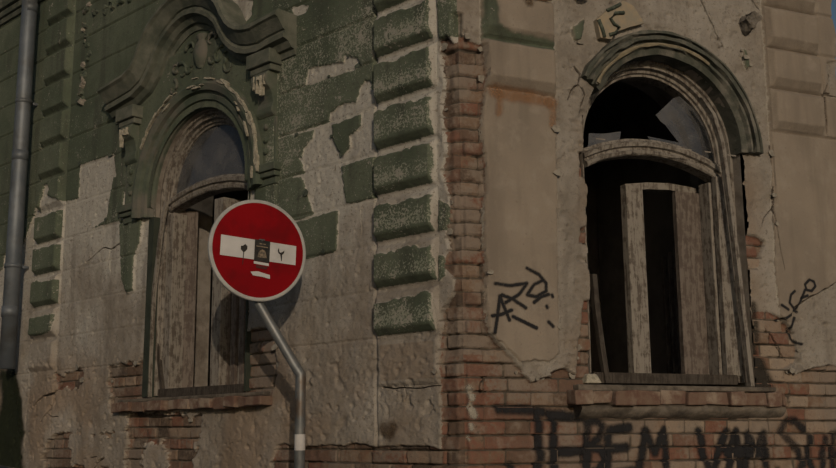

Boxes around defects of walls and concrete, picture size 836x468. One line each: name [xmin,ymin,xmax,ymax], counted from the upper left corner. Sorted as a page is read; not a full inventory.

peeling [233,0,253,21]
crack [699,0,725,50]
peeling [186,77,259,178]
peeling [76,154,116,234]
crack [85,241,121,275]
spalling [295,0,836,468]
leakage [0,369,25,468]
crack [32,382,64,426]
spalling [106,360,149,410]
spalling [124,412,203,468]
spalling [247,328,279,396]
spalling [272,443,294,468]